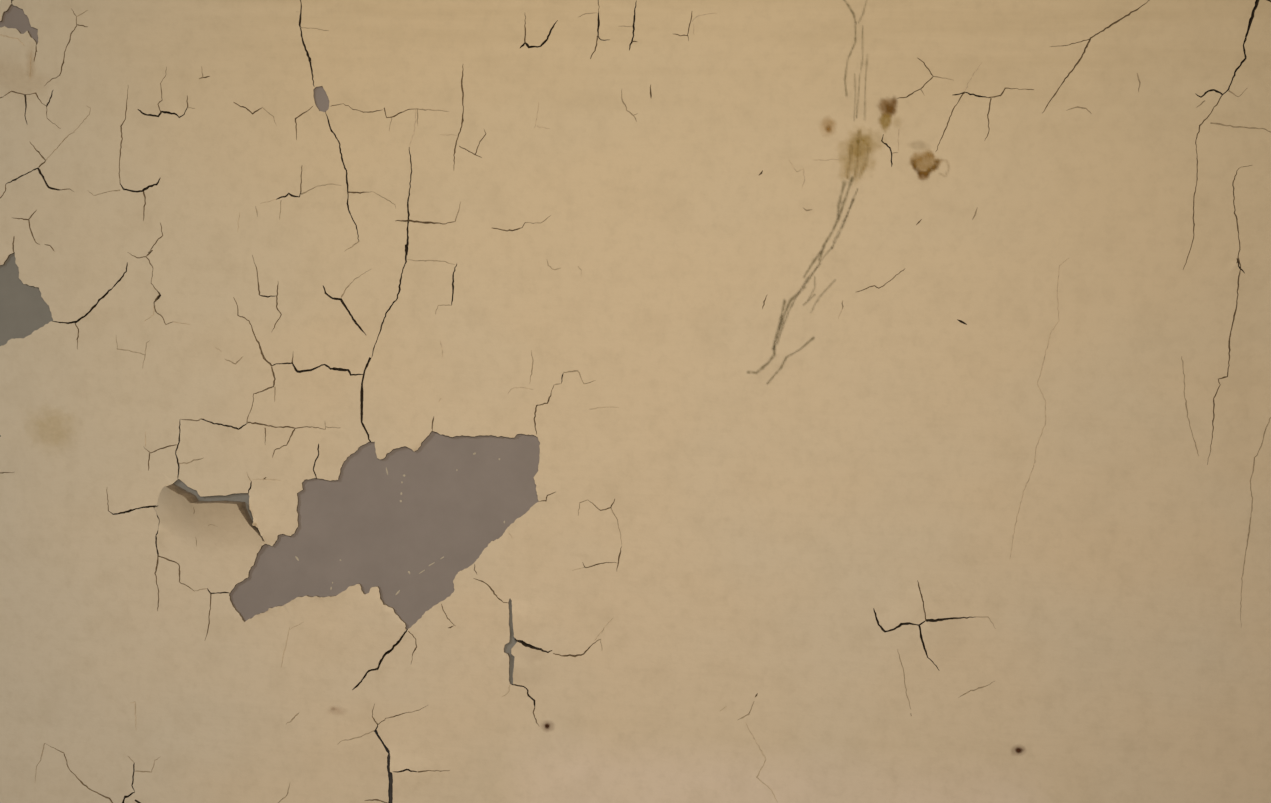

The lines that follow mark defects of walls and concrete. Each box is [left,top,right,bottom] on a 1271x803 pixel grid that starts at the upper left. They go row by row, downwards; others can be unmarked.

peeling [0,4,38,45]
crack [0,10,210,369]
peeling [313,86,329,112]
crack [520,0,637,59]
crack [897,0,1149,151]
crack [1183,0,1271,269]
peeling [0,252,53,346]
crack [107,0,486,639]
peeling [229,431,540,630]
crack [338,629,450,803]
crack [473,565,613,727]
crack [873,580,996,716]